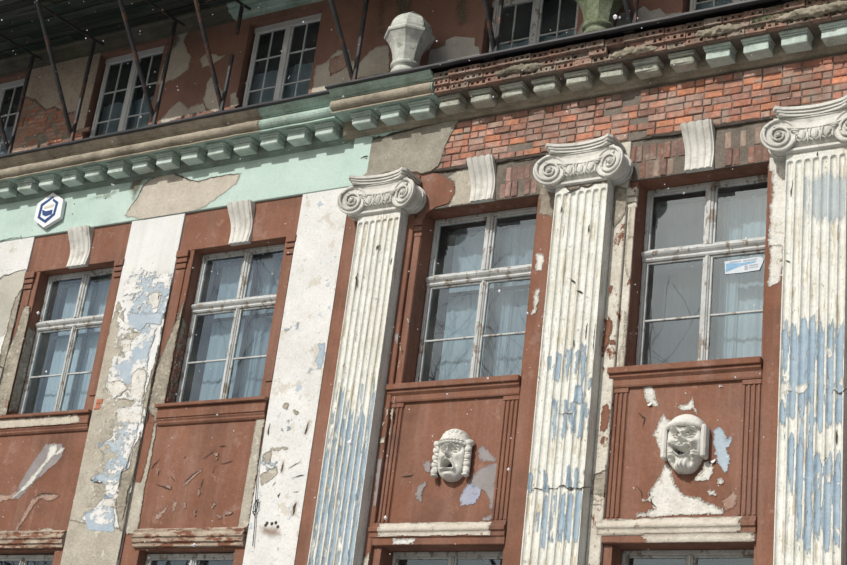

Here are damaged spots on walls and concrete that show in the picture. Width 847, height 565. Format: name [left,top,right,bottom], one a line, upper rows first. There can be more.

peeling [427,36,480,65]
flaking render [0,53,262,180]
peeling [125,173,240,219]
flaking render [363,54,847,287]
peeling [0,265,196,565]
peeling [309,365,376,565]
peeling [377,446,497,544]
crack [524,483,592,491]
peeling [527,464,606,549]
peeling [644,386,671,451]
peeling [596,427,755,543]
peeling [780,314,844,554]